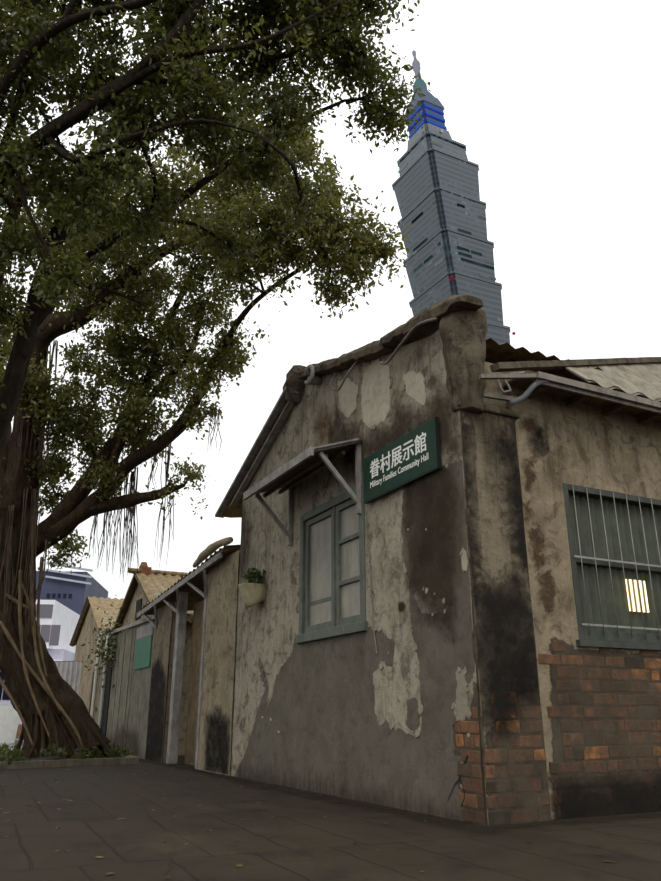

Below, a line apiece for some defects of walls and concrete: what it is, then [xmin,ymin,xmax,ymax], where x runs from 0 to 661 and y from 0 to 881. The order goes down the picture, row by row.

flaking render [337,358,392,429]
flaking render [403,368,427,407]
water stain [330,396,539,732]
flaking render [235,460,661,826]
water stain [205,709,229,774]